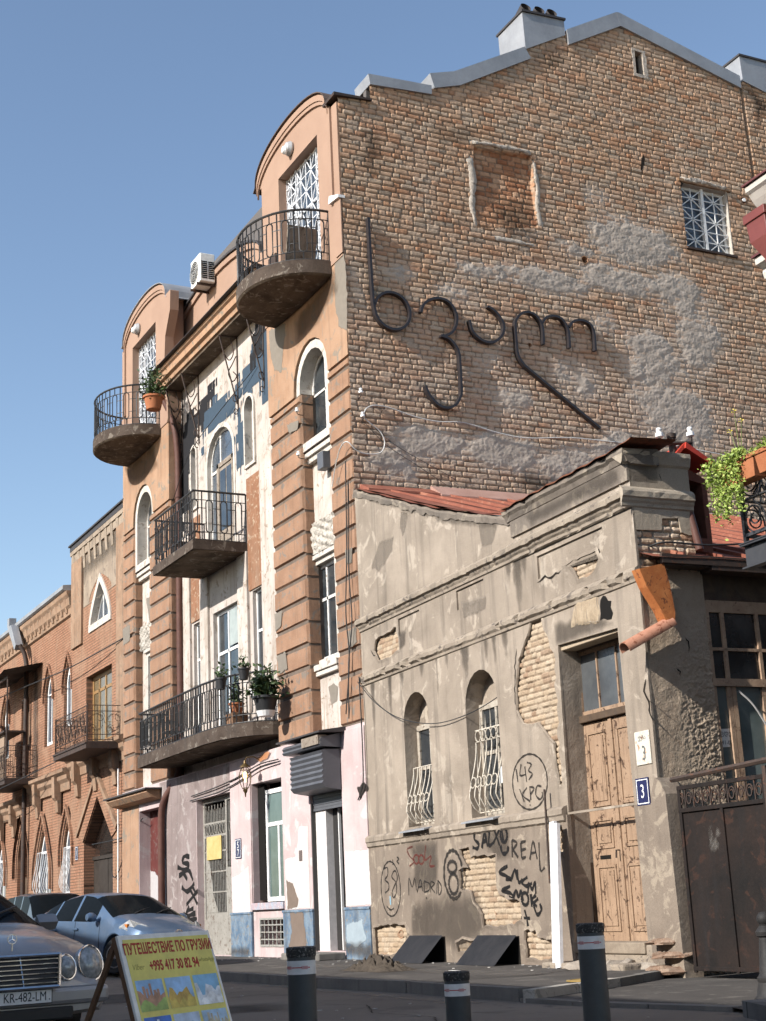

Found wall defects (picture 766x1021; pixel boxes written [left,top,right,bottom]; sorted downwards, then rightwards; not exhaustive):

flaking render [571,596,613,628]
flaking render [373,624,401,664]
flaking render [514,618,564,789]
peeling [344,849,371,906]
flaking render [454,843,552,965]
flaking render [346,919,410,959]